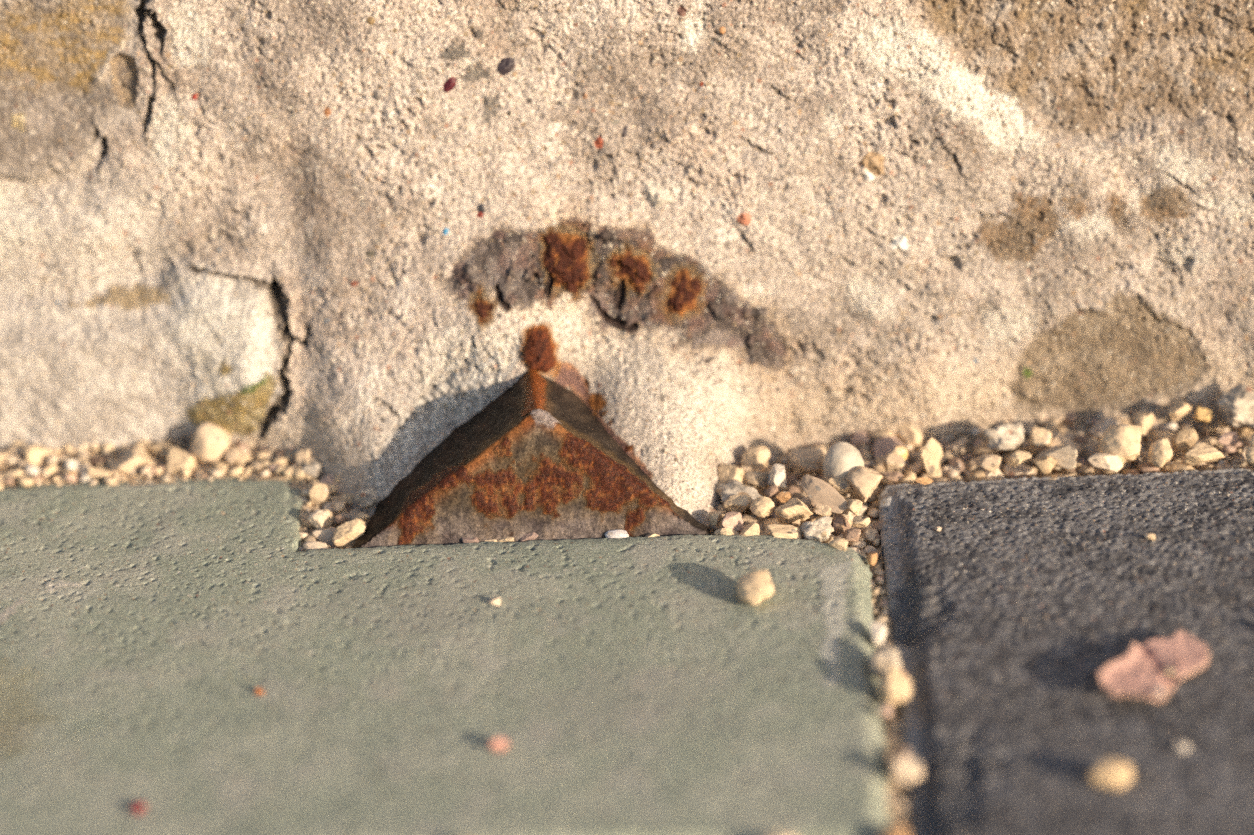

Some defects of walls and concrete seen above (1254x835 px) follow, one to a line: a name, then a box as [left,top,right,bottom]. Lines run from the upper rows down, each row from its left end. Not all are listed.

crack [135,0,175,135]
crack [91,125,108,171]
crack [189,266,312,439]
corrosion [438,217,789,374]
corrosion [398,363,671,545]